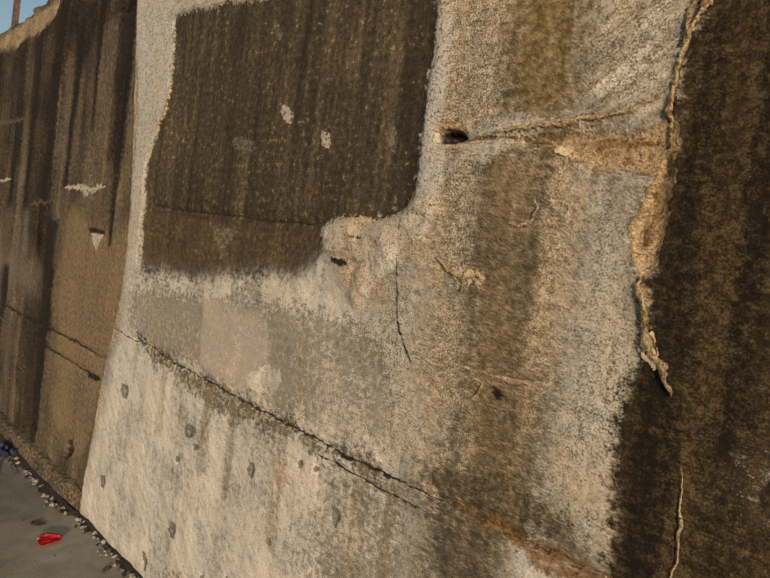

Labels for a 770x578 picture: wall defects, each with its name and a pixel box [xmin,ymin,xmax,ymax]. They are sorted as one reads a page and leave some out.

damp [0,0,138,442]
peeling [80,0,441,578]
crack [115,328,612,578]
crack [396,259,411,362]
spalling [434,122,468,144]
damp [434,151,543,578]
crack [467,0,713,152]
peeling [496,0,705,578]
crack [669,470,684,578]
damp [604,0,770,578]